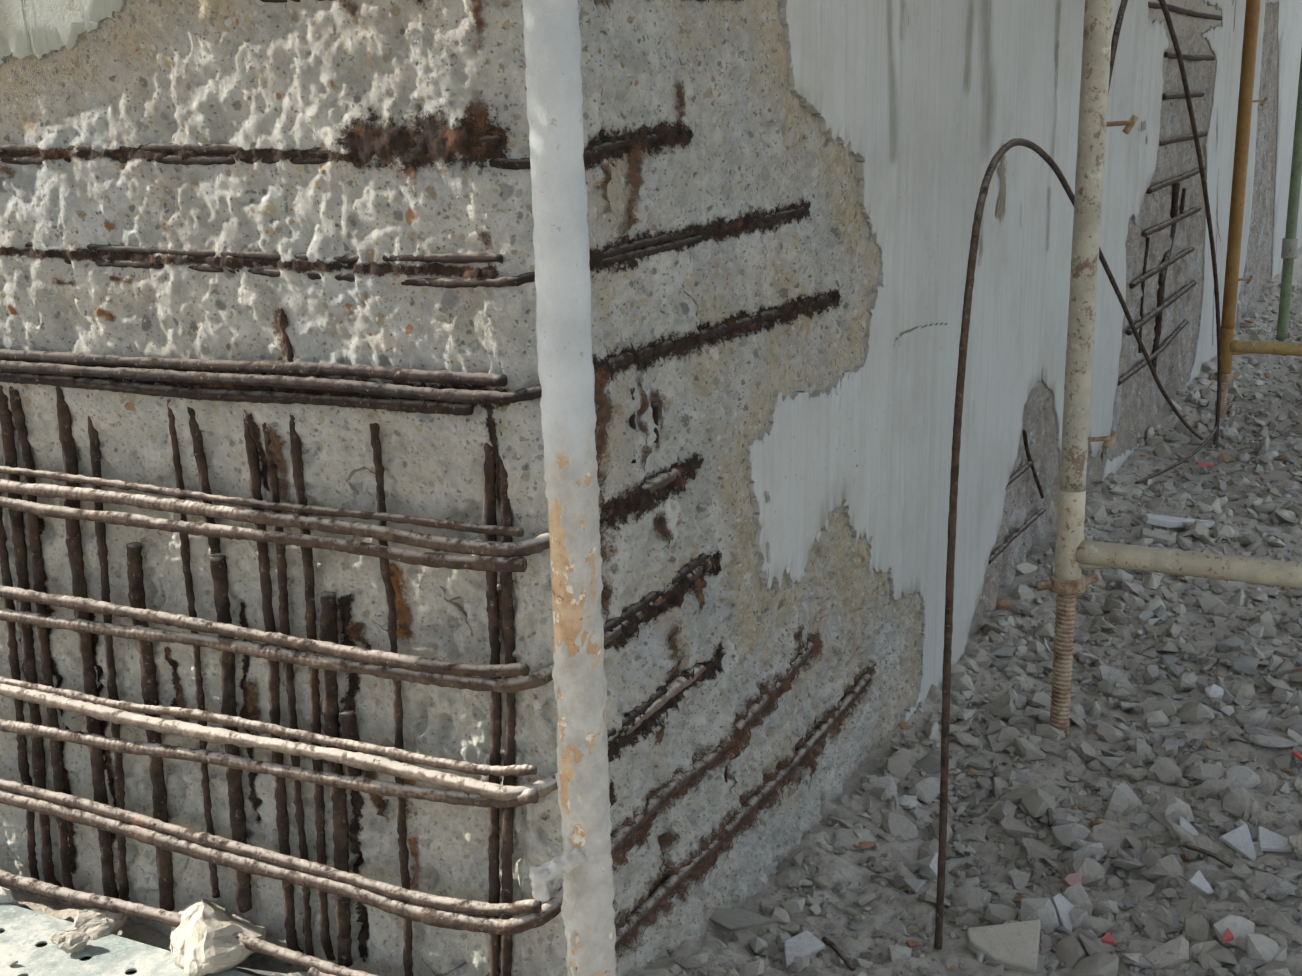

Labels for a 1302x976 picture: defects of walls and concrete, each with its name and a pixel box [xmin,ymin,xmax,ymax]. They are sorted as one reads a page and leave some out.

corrosion [0,99,515,197]
spalling [1086,0,1278,487]
corrosion [164,647,189,723]
corrosion [239,602,262,824]
spalling [0,0,568,976]
corrosion [63,310,510,507]
corrosion [337,593,371,650]
corrosion [353,900,369,963]
corrosion [348,770,389,874]
corrosion [592,288,876,959]
spalling [578,0,922,976]
spalling [934,138,1075,950]